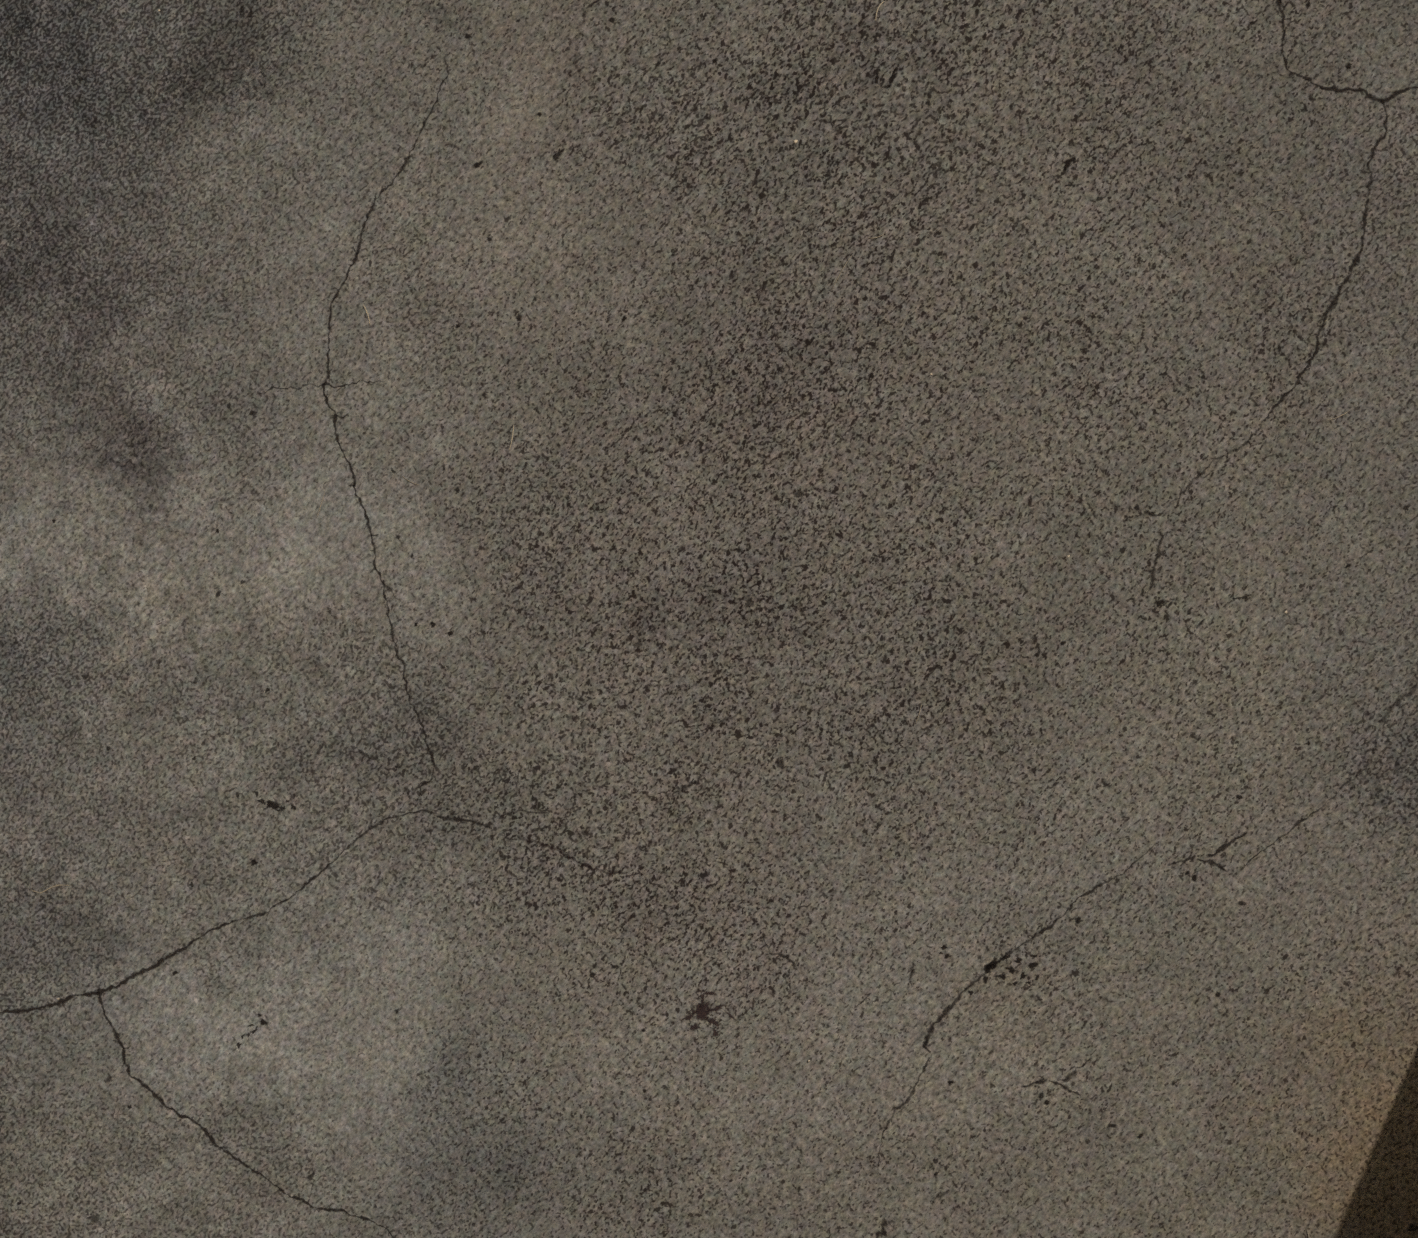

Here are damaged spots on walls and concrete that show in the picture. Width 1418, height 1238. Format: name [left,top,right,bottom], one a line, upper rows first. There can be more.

crack [1245,0,1418,445]
crack [0,70,488,1238]
crack [1150,537,1163,590]
crack [540,843,639,876]
crack [878,771,1362,1162]